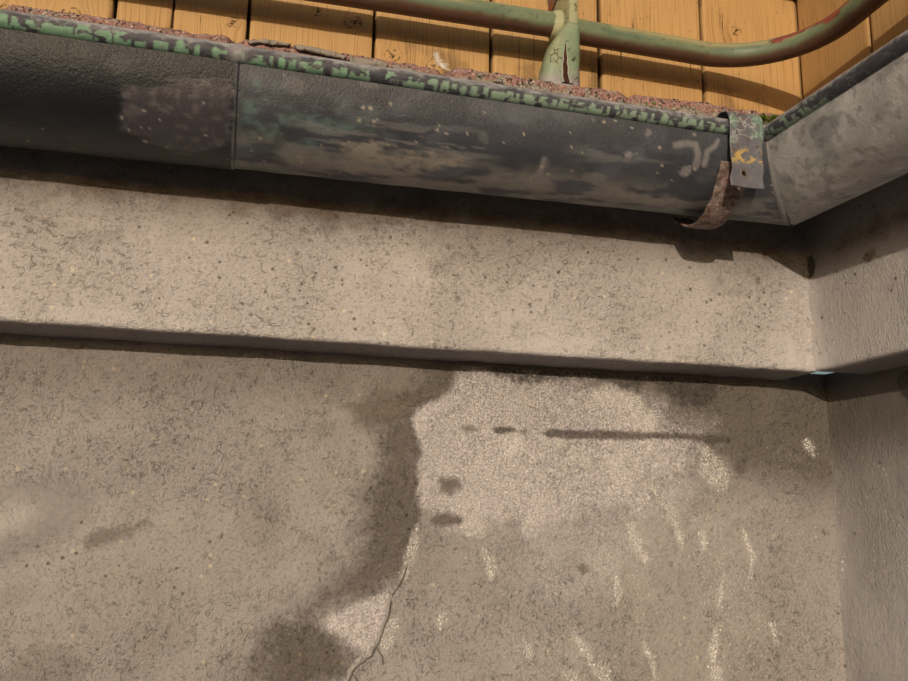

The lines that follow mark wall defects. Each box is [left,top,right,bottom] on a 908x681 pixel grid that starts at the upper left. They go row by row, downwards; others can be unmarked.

crack [345,566,408,681]
damp [253,367,746,681]